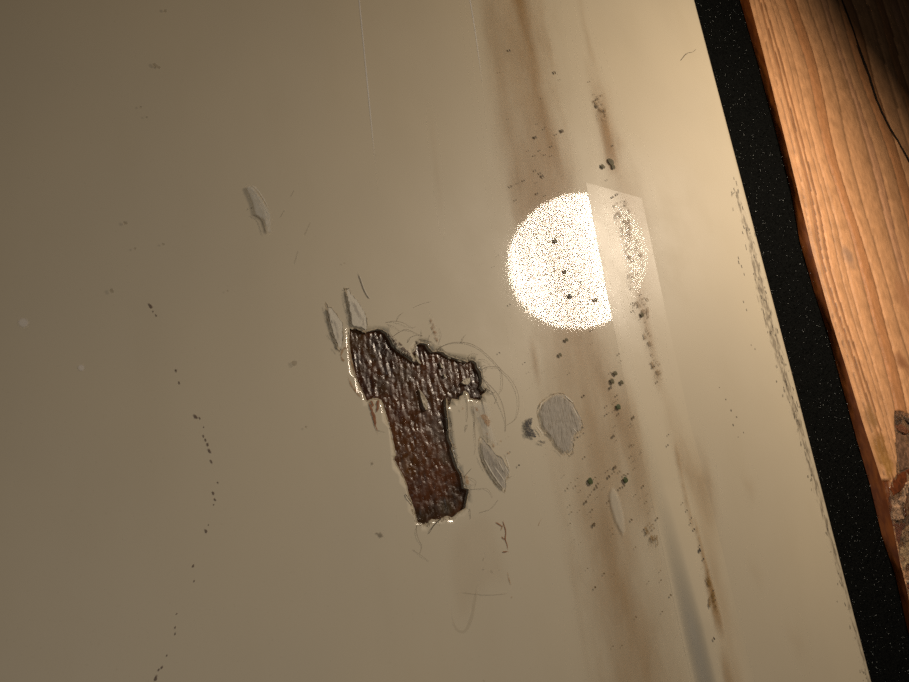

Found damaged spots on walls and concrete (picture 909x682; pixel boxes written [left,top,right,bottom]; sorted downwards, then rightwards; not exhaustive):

leakage [612,193,643,262]
peeling [325,288,370,352]
peeling [537,393,583,456]
peeling [478,436,510,493]
leakage [564,465,629,527]